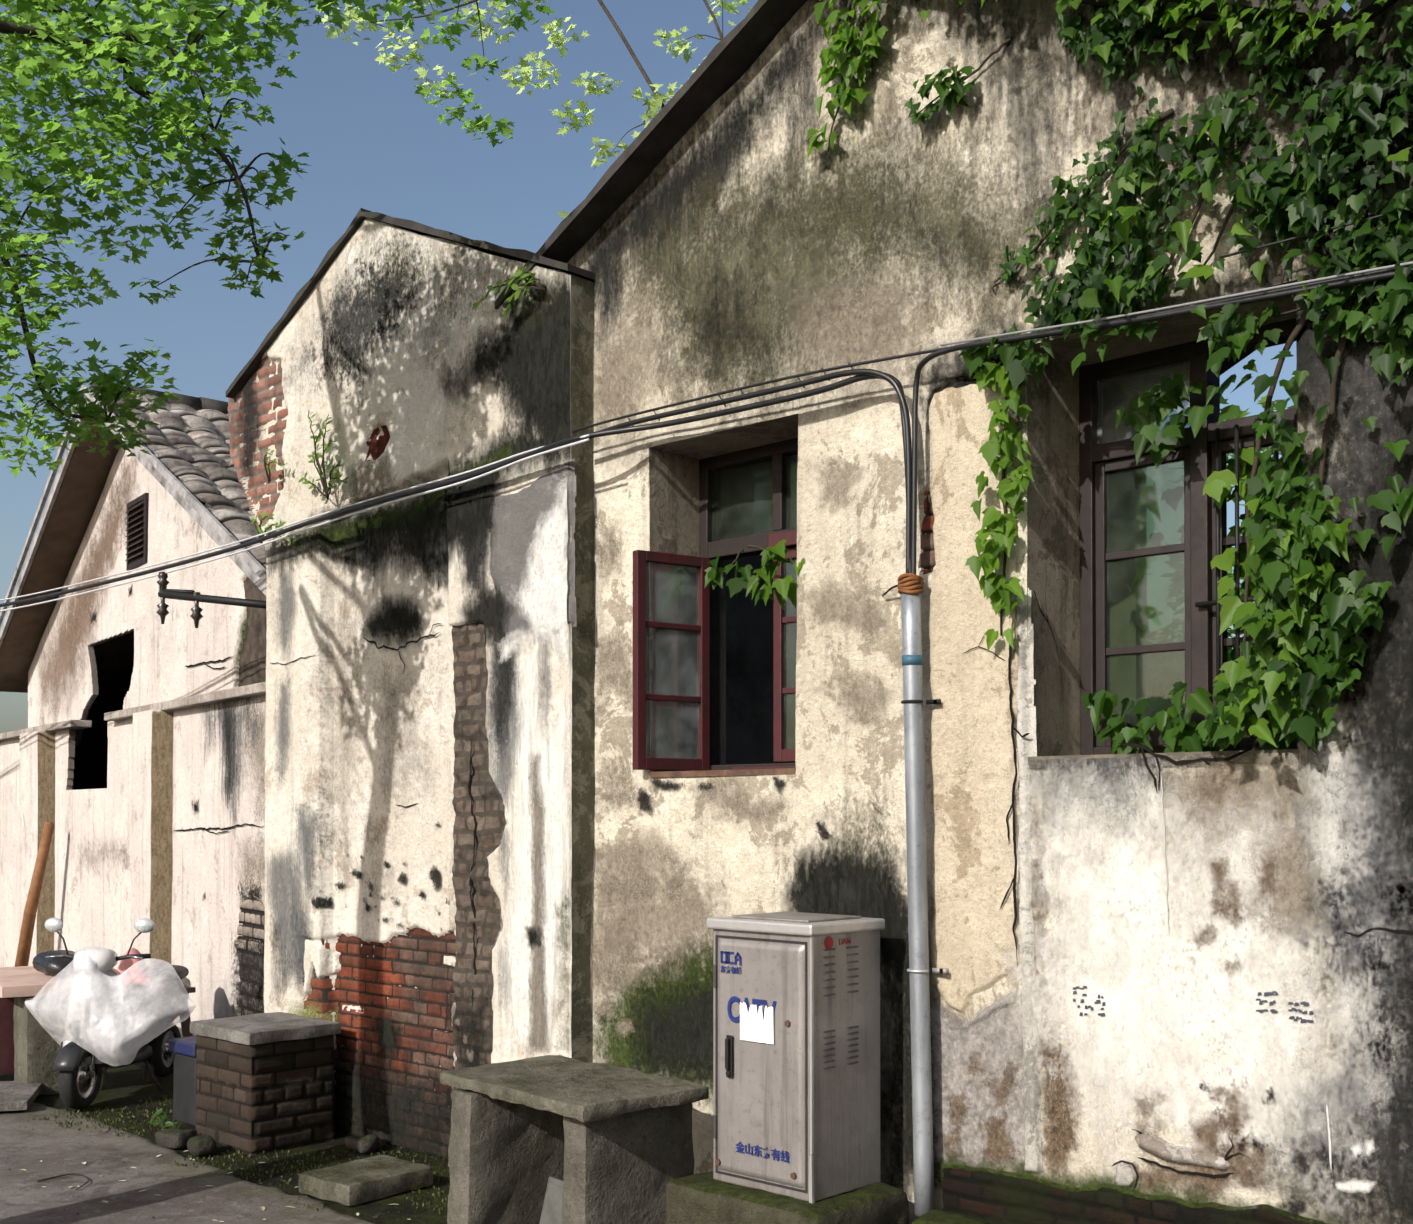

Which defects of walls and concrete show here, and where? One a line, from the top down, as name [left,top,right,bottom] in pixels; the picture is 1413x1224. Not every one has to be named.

flaking render [227,356,288,533]
spalling [365,425,390,463]
leakage [268,0,1413,797]
flaking render [229,897,265,1017]
leakage [238,808,340,986]
flaking render [301,623,506,1167]
leakage [526,757,547,1051]
leakage [786,807,905,966]
crack [1119,743,1258,936]
leakage [1029,280,1413,1224]
rust [1211,858,1241,923]